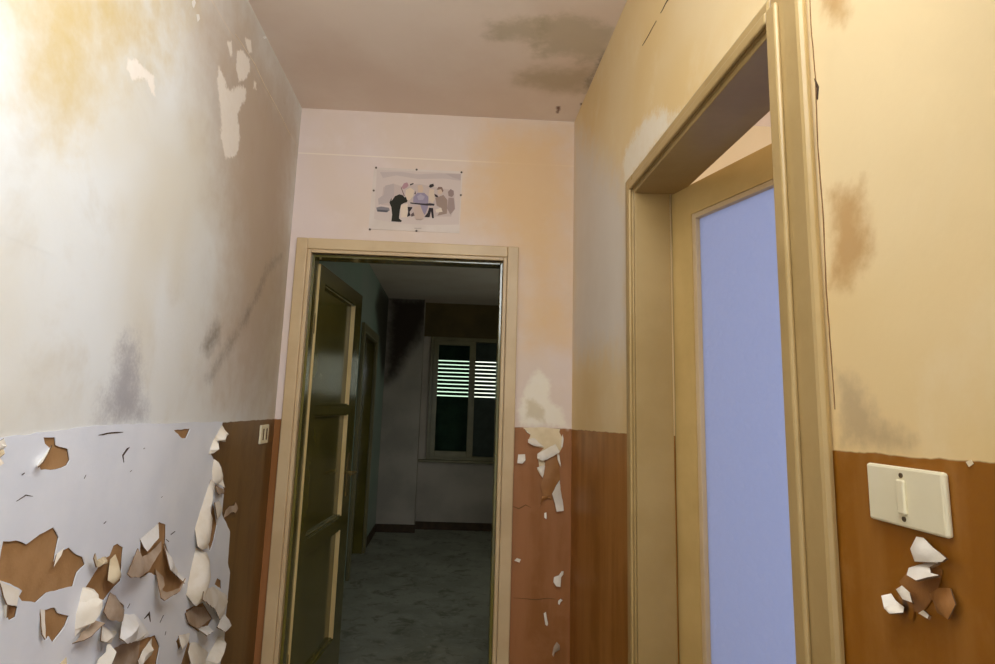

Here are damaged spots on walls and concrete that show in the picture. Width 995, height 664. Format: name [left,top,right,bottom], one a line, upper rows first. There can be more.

flaking render [122,49,159,107]
flaking render [212,31,267,170]
leakage [0,0,302,534]
leakage [419,0,633,412]
flaking render [514,362,572,519]
peeling [0,422,232,664]
peeling [881,537,956,621]